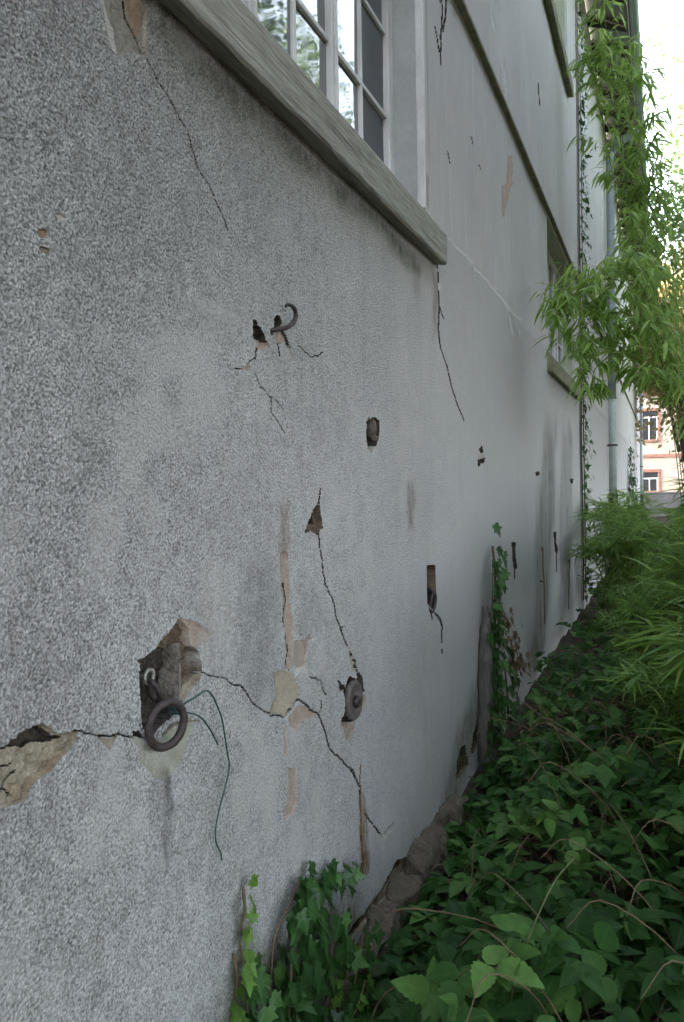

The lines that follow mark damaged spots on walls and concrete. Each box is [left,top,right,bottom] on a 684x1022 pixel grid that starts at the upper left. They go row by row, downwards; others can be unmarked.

flaking render [101,0,150,57]
crack [434,0,447,65]
crack [122,1,228,230]
crack [437,265,464,421]
crack [255,374,286,434]
crack [317,533,358,674]
spalling [156,617,211,701]
flaking render [269,550,315,756]
flaking render [0,723,78,809]
crack [64,729,144,750]
crack [193,671,396,880]
flaking render [348,857,406,939]